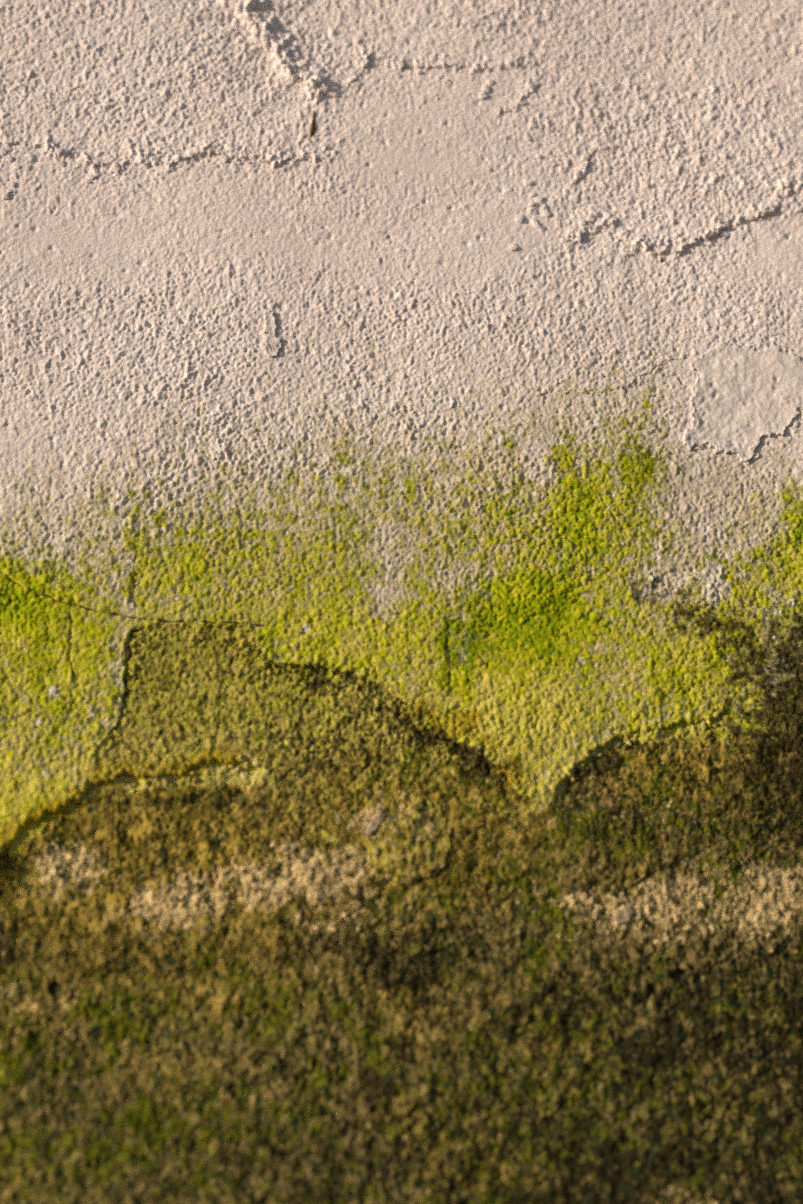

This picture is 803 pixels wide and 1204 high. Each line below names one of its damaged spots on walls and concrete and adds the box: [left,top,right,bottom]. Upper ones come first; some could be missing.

flaking render [536,342,803,464]
water stain [124,490,147,562]
water stain [153,507,168,526]
water stain [331,440,352,524]
water stain [545,434,579,523]
water stain [613,387,653,527]
crack [0,544,268,735]
water stain [436,585,489,689]
water stain [305,662,521,805]
water stain [575,739,639,828]
water stain [629,577,803,856]
water stain [327,920,442,990]